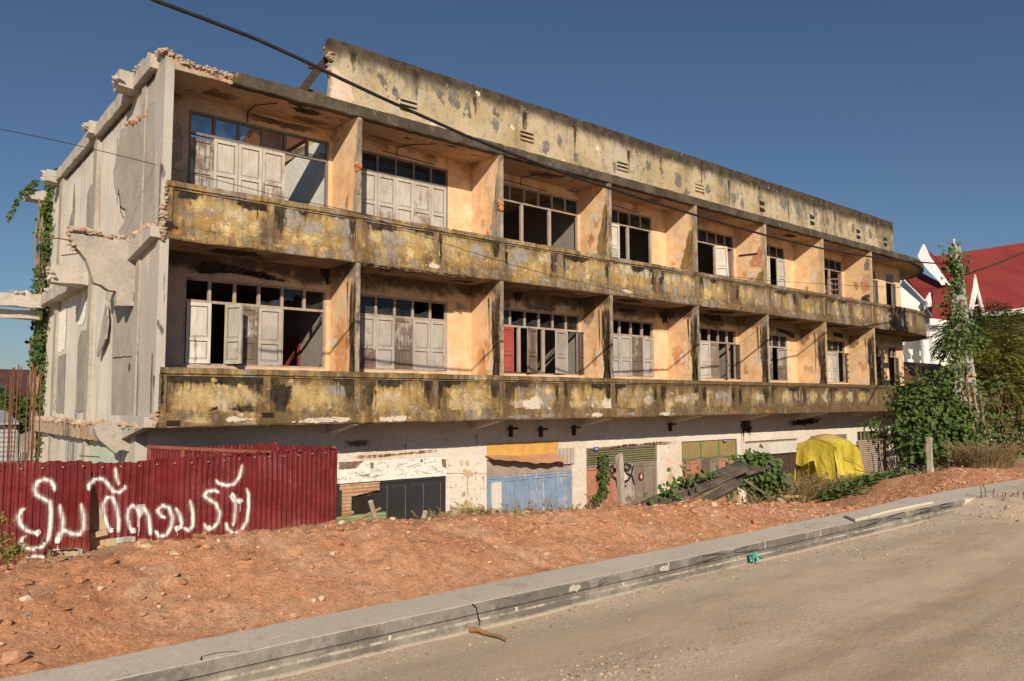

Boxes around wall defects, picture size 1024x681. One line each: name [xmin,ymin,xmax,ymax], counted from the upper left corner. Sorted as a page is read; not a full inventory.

spalling [132,47,233,86]
peeling [377,62,400,102]
peeling [434,84,480,118]
peeling [542,136,578,161]
peeling [68,184,93,228]
leakage [350,221,449,258]
leakage [493,243,508,264]
leakage [551,254,590,272]
leakage [631,266,664,286]
leakage [422,380,461,409]
peeling [508,385,561,430]
peeling [339,461,374,470]